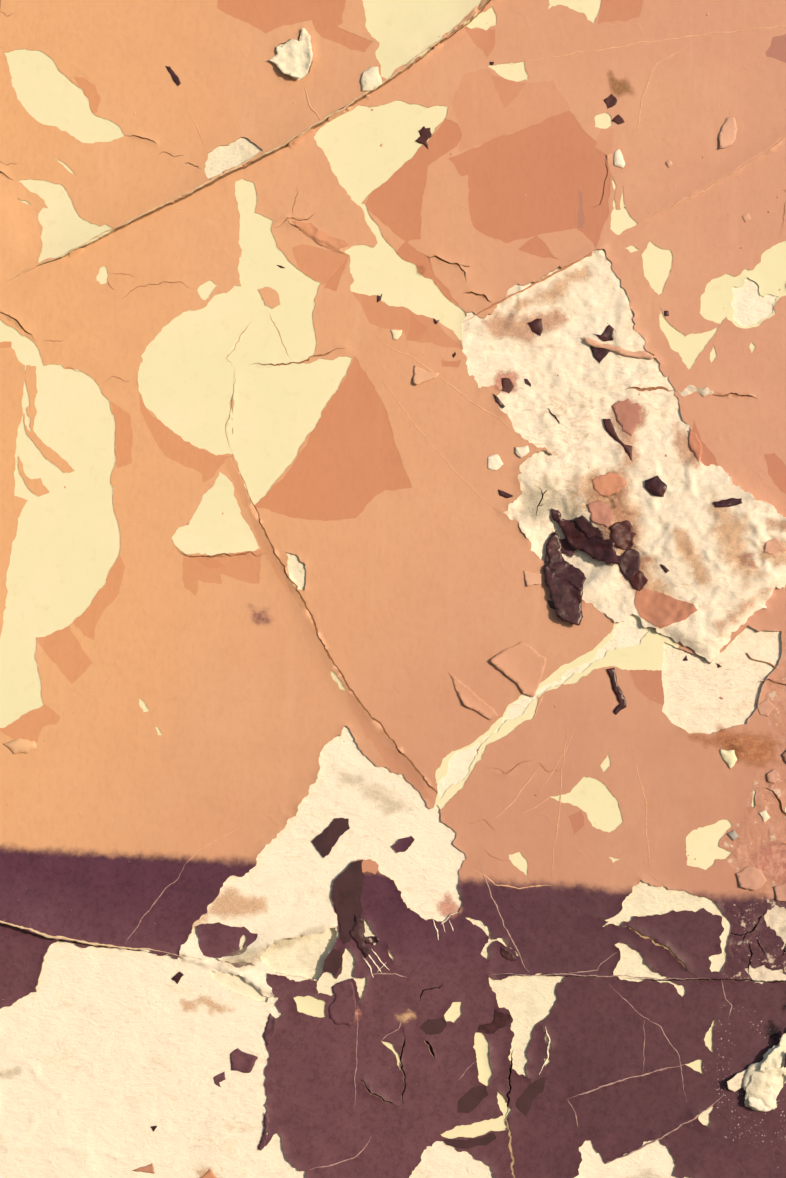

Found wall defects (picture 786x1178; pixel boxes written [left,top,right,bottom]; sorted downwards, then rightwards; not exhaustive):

peeling [5,49,125,143]
crack [7,0,491,280]
crack [0,312,61,342]
crack [108,273,189,293]
peeling [0,137,352,754]
crack [183,314,437,800]
spalling [0,241,786,1178]
crack [0,921,187,958]
crack [504,1049,516,1178]